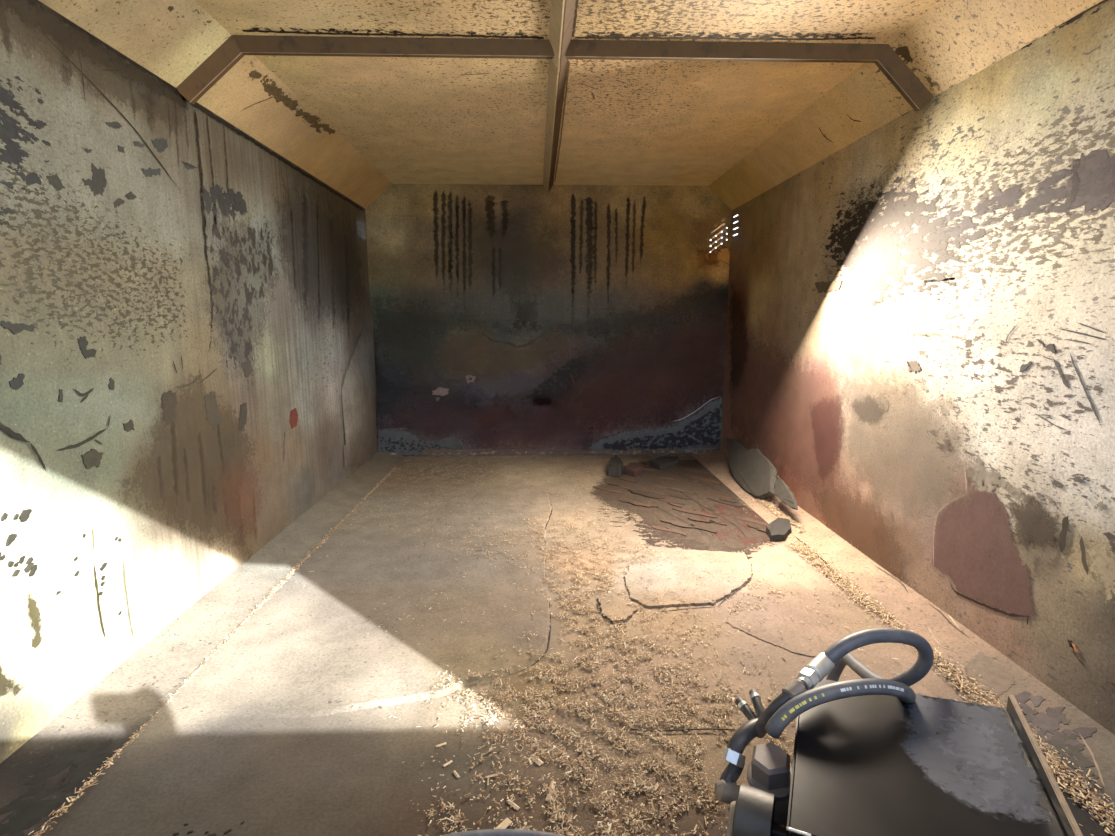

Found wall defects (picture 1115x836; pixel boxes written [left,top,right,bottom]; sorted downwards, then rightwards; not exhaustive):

peeling [0,76,193,390]
water stain [432,191,508,299]
water stain [570,194,646,302]
peeling [823,87,1115,307]
crack [0,422,46,471]
peeling [58,388,94,403]
water stain [377,396,786,551]
crack [489,498,552,681]
crack [669,579,751,611]
corrosion [932,490,1033,625]